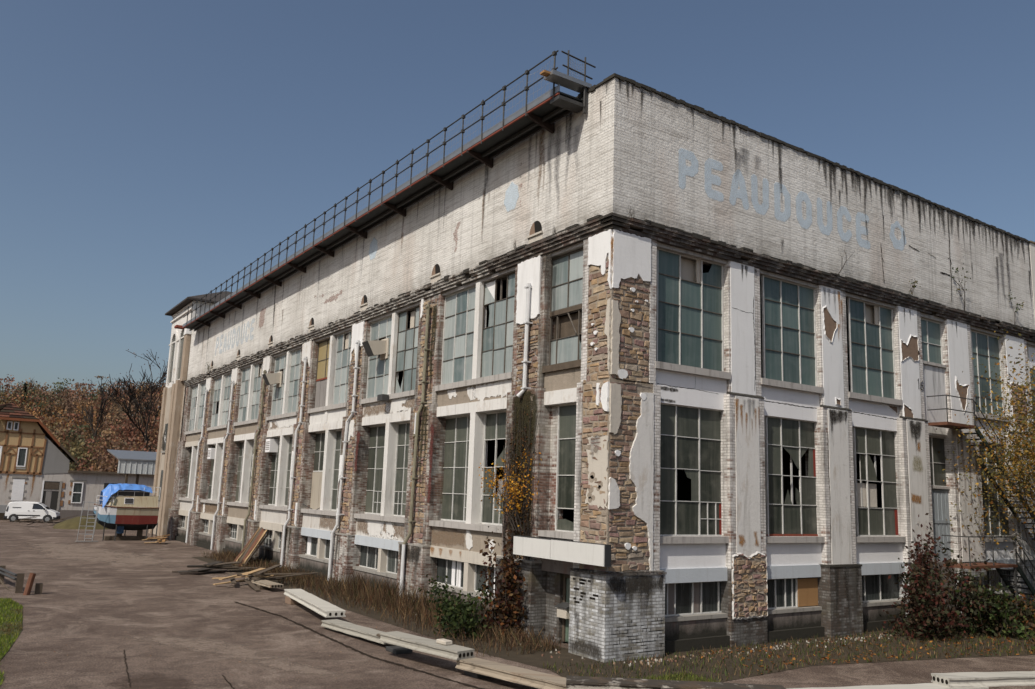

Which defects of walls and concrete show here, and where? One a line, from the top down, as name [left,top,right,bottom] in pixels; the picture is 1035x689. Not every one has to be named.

leakage [529,113,572,187]
leakage [818,159,1031,294]
spalling [822,305,837,344]
spalling [900,334,919,362]
spalling [320,298,473,550]
spalling [447,255,542,559]
spalling [573,229,654,604]
spalling [732,551,768,620]
crack [235,602,484,689]